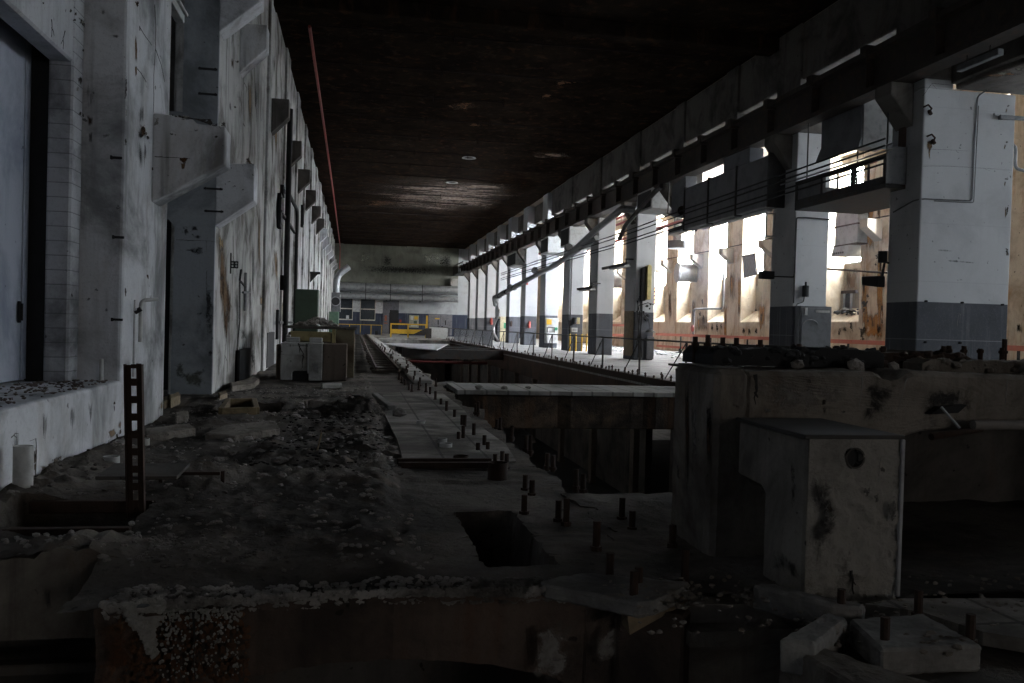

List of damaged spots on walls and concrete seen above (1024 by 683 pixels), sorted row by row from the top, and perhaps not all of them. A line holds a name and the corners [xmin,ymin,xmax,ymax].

corrosion [218,237,230,337]
corrosion [861,263,883,337]